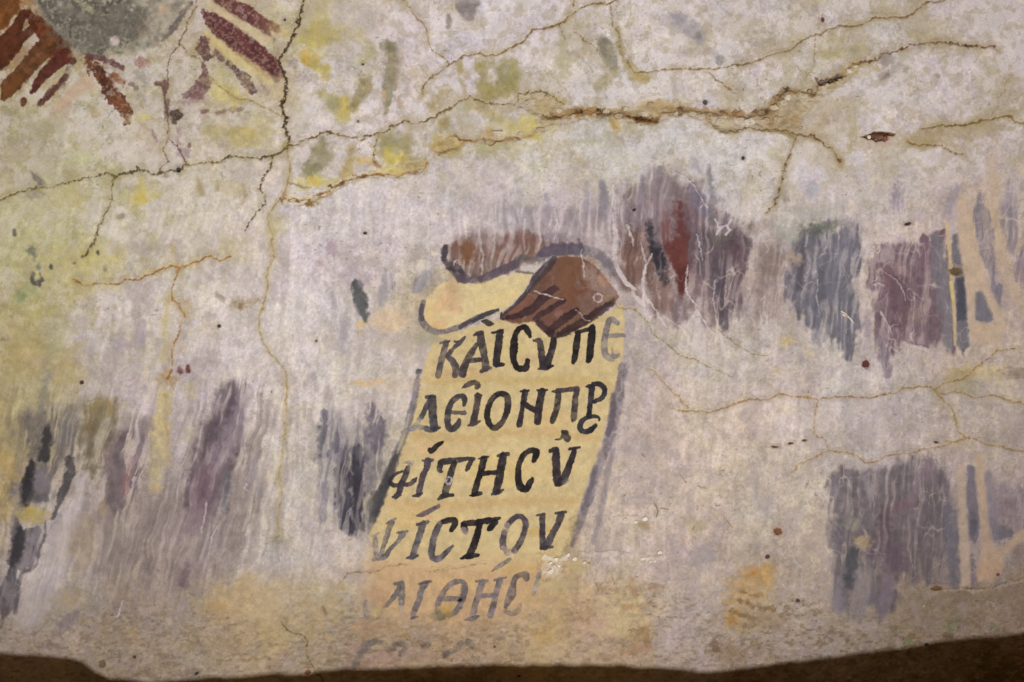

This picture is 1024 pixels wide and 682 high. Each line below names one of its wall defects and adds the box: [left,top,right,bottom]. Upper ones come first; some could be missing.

flaking render [275,45,898,209]
flaking render [842,131,915,155]
crack [0,0,1024,543]